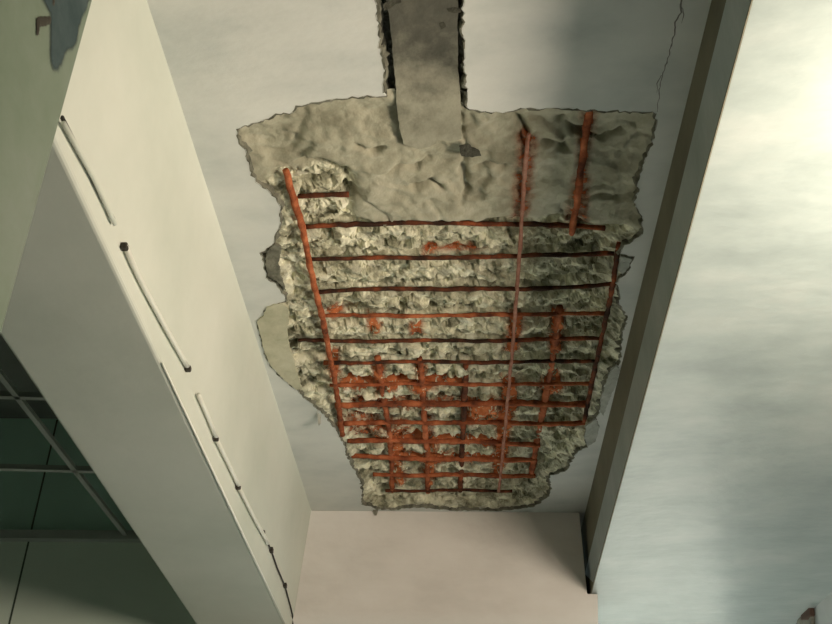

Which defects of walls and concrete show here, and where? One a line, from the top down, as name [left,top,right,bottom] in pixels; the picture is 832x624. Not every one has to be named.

peeling [36,0,89,70]
crack [656,0,684,112]
corrosion [513,129,536,216]
spalling [236,0,658,515]
corrosion [424,241,477,255]
corrosion [504,312,524,352]
corrosion [327,349,518,486]